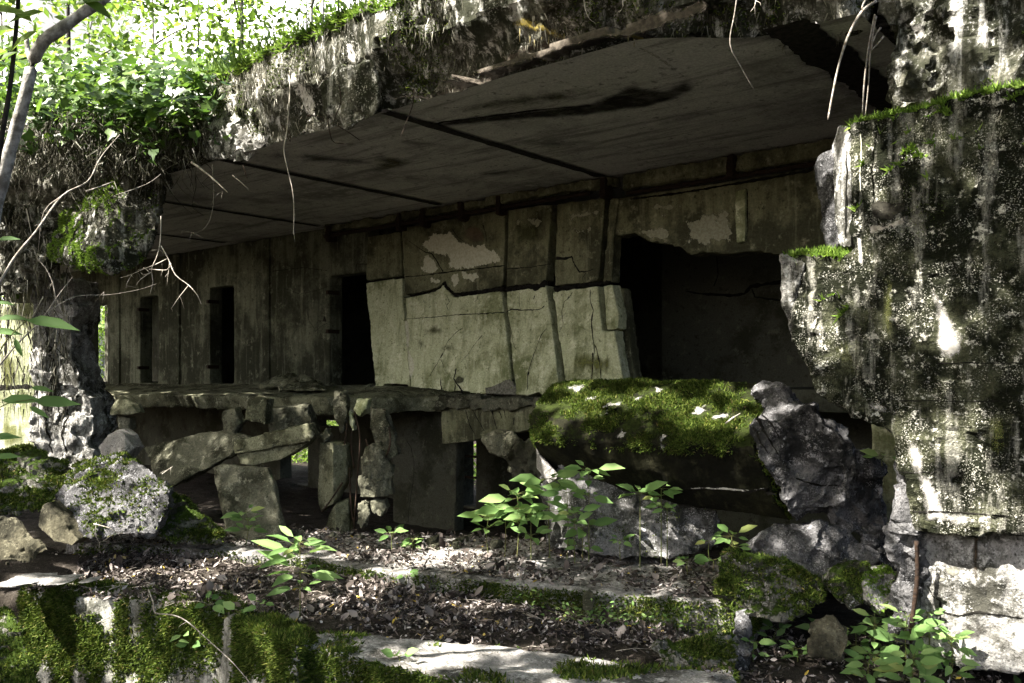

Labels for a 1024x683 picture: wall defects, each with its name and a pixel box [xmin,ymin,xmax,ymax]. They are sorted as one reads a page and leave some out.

spalling [642,204,681,240]
flaking render [683,210,732,245]
flaking render [421,232,500,287]
crack [356,241,611,434]
damp [939,316,959,354]